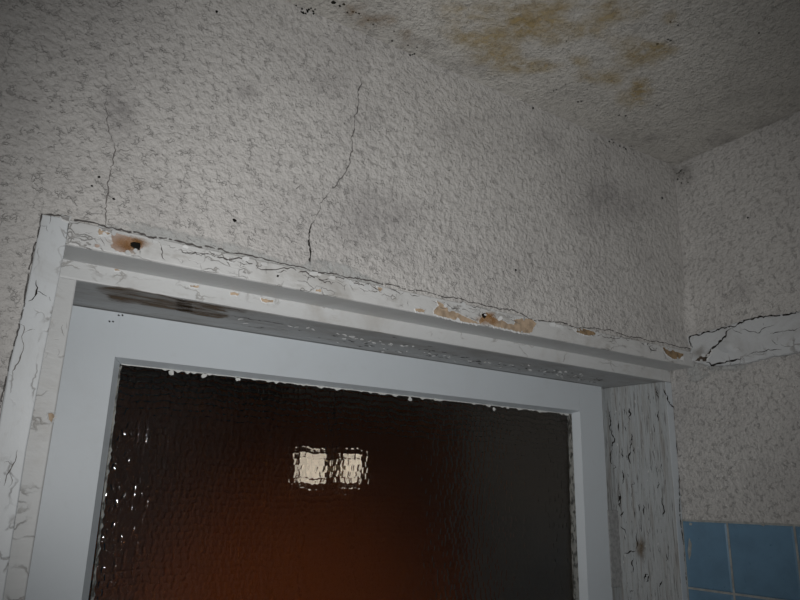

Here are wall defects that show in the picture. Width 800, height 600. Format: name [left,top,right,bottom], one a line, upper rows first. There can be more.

crack [0,79,799,408]
leakage [102,287,237,318]
peeling [414,300,537,335]